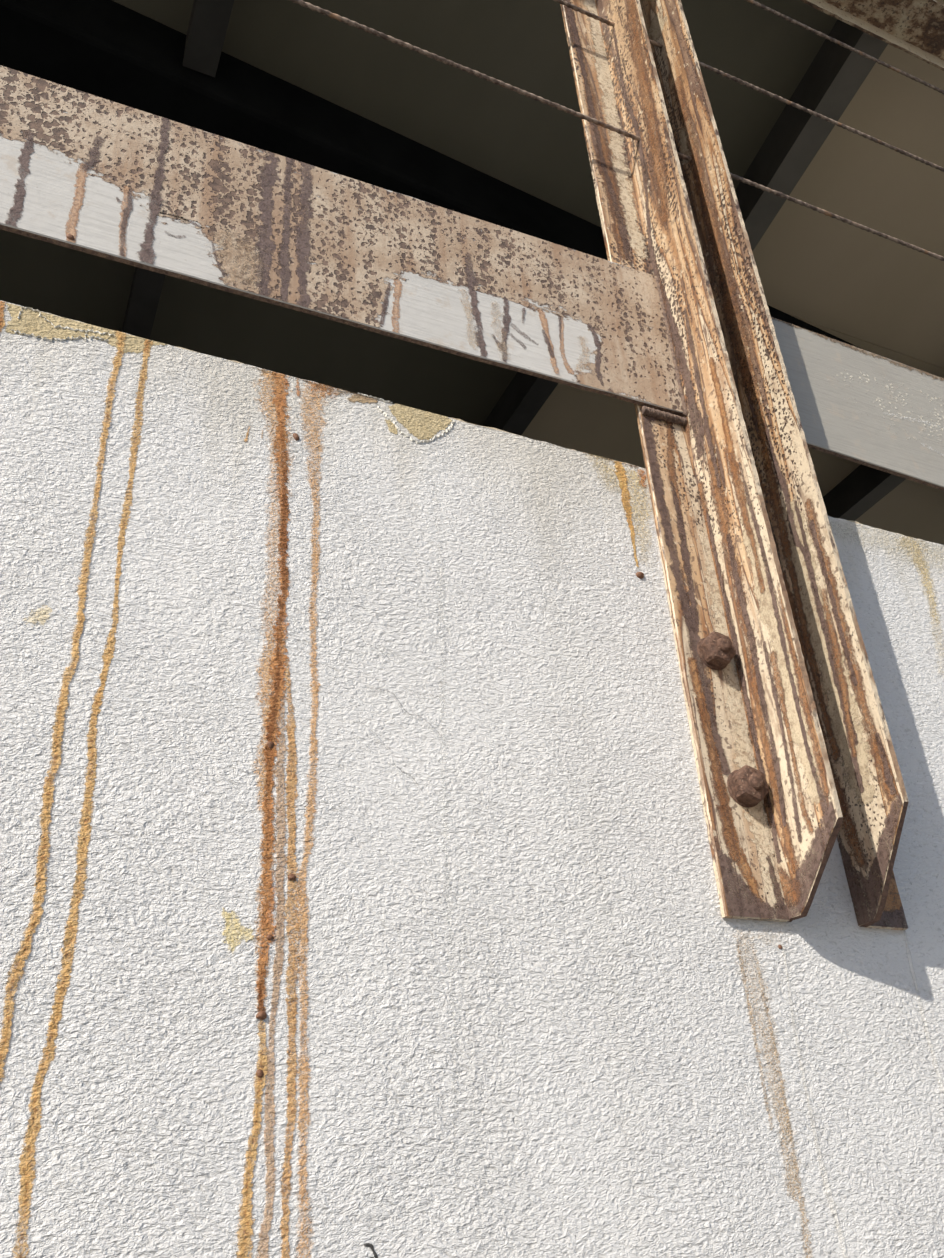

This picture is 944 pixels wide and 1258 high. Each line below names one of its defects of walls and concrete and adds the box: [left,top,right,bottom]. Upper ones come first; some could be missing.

corrosion [0,331,153,1258]
corrosion [236,364,379,1258]
corrosion [0,0,908,928]